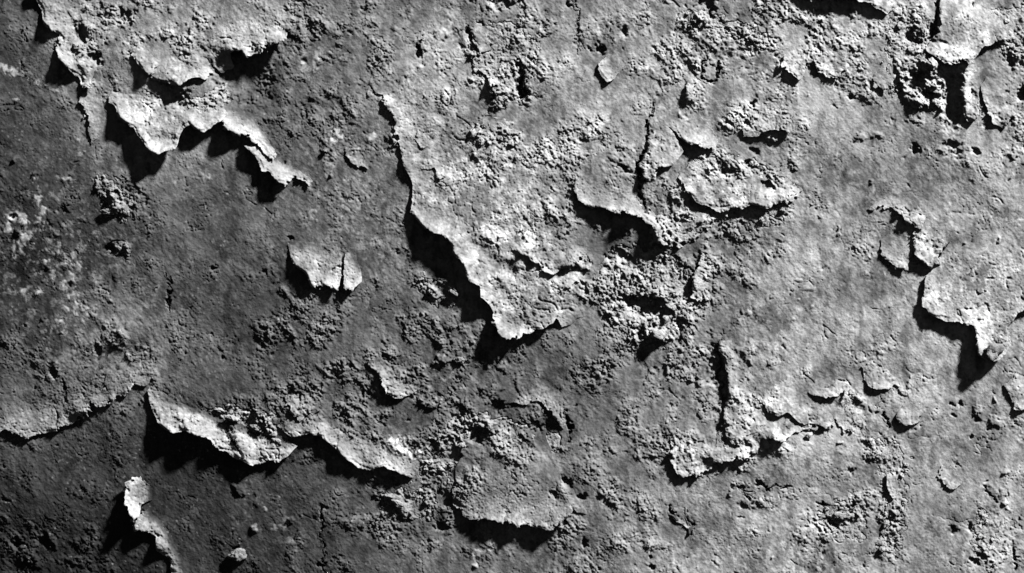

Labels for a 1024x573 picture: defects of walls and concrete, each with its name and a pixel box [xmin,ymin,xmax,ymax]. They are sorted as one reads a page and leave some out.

flaking render [36,0,313,187]
flaking render [369,16,803,350]
crack [634,105,656,213]
flaking render [857,0,1024,129]
flaking render [287,240,362,292]
flaking render [868,193,1024,361]
flaking render [0,356,587,531]
flaking render [668,340,857,478]
flaking render [861,359,900,389]
flaking render [124,476,192,573]